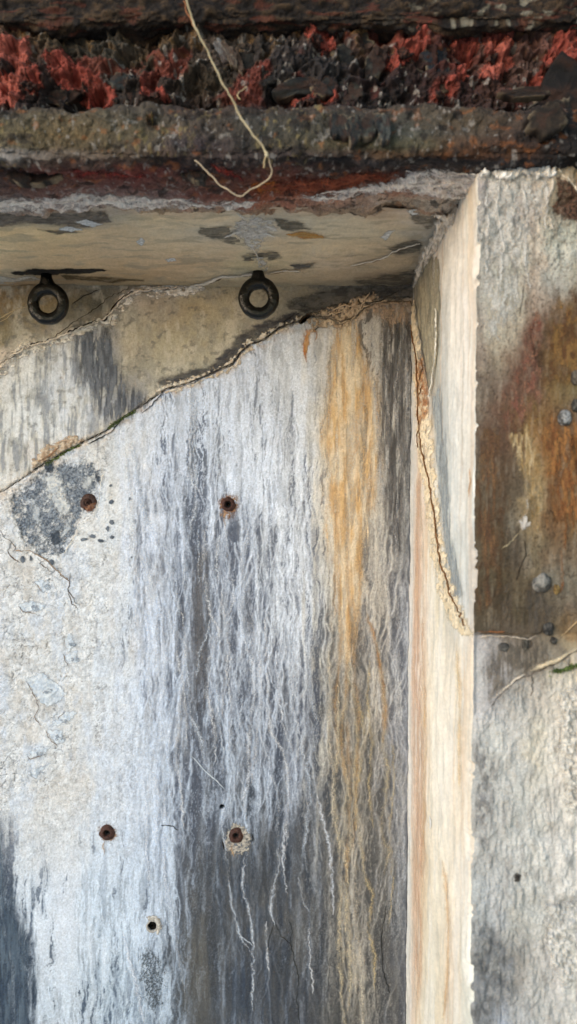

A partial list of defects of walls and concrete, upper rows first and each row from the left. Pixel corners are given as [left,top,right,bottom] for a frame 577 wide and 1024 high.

peeling [0,31,170,110]
peeling [213,37,276,87]
peeling [303,20,515,104]
peeling [524,25,577,143]
crack [0,270,301,364]
corrosion [303,329,317,362]
crack [0,291,577,705]
corrosion [321,320,380,663]
damp [374,316,411,582]
corrosion [468,418,577,607]
damp [126,447,385,1023]
damp [0,836,35,1024]